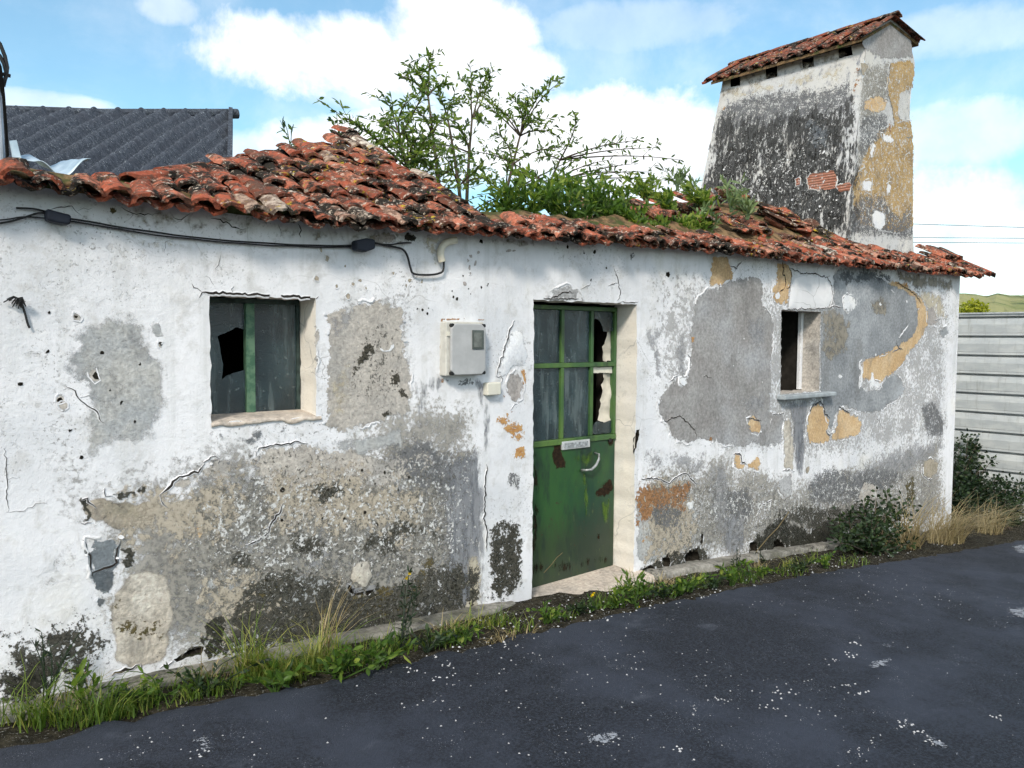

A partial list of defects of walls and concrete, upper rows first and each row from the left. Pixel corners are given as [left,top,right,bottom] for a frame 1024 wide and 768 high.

damp [703,63,913,240]
flaking render [81,498,204,668]
crack [160,455,218,508]
damp [0,294,523,704]
flaking render [256,279,433,526]
crack [496,320,515,383]
rust [497,413,525,459]
rust [635,481,691,526]
crack [635,472,697,488]
crack [665,415,697,437]
flaking render [656,254,809,499]
flaking render [806,267,949,447]